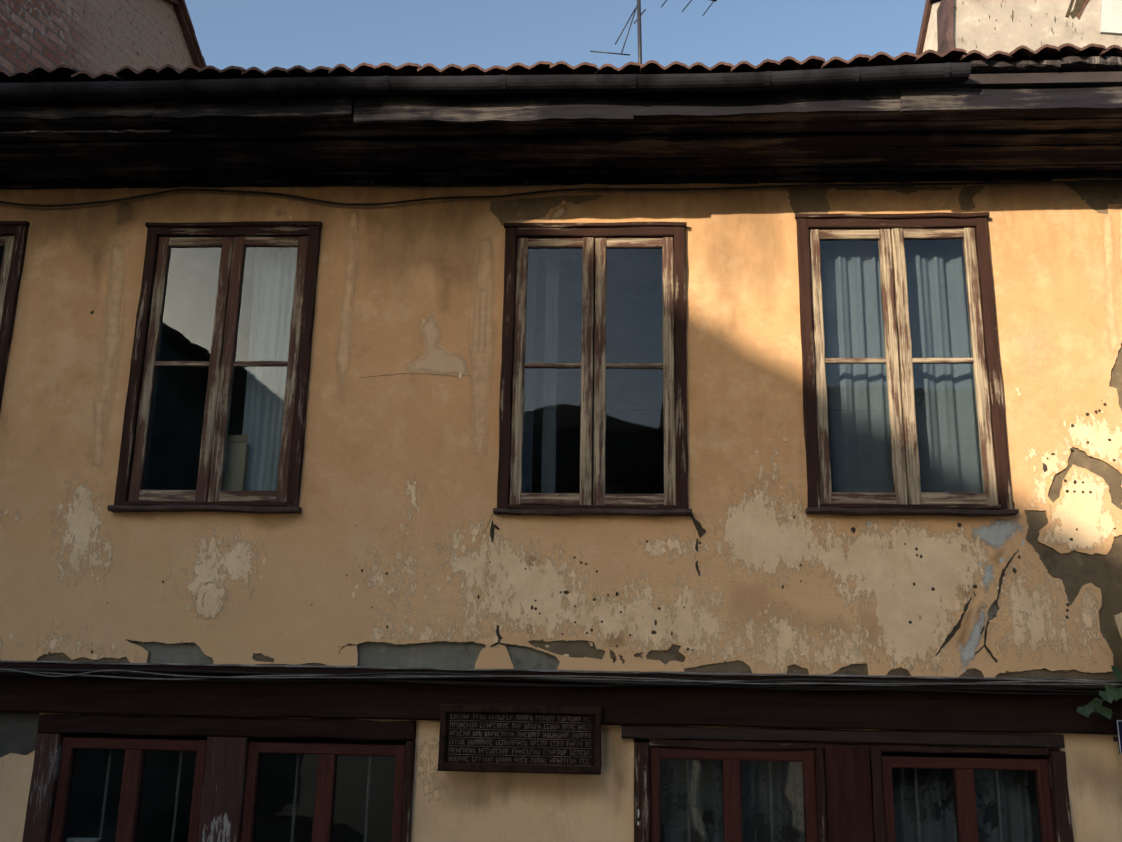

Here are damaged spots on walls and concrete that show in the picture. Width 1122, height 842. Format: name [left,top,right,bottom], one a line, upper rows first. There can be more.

flaking render [490,195,602,226]
flaking render [788,185,985,214]
flaking render [1064,179,1122,214]
peeling [410,318,466,379]
peeling [49,471,114,590]
peeling [162,527,275,617]
crack [690,514,706,576]
peeling [357,343,1122,680]
crack [936,550,1019,663]
flaking render [37,620,214,664]
peeling [202,812,231,842]